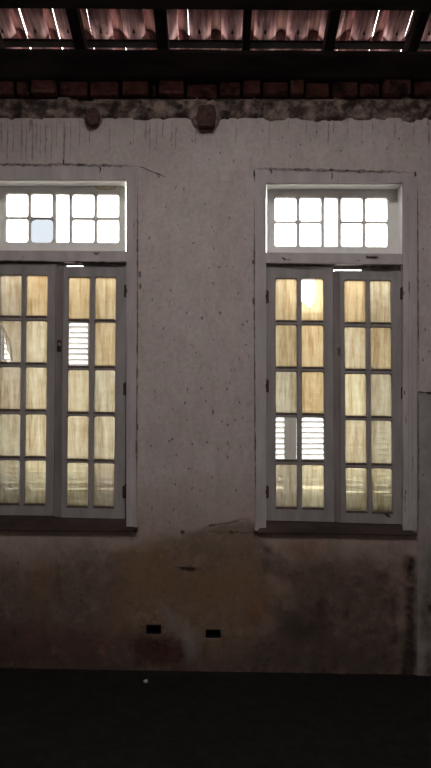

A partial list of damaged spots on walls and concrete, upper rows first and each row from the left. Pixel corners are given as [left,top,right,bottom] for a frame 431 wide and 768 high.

flaking render [0,97,431,123]
crack [2,159,122,173]
water stain [0,541,431,675]